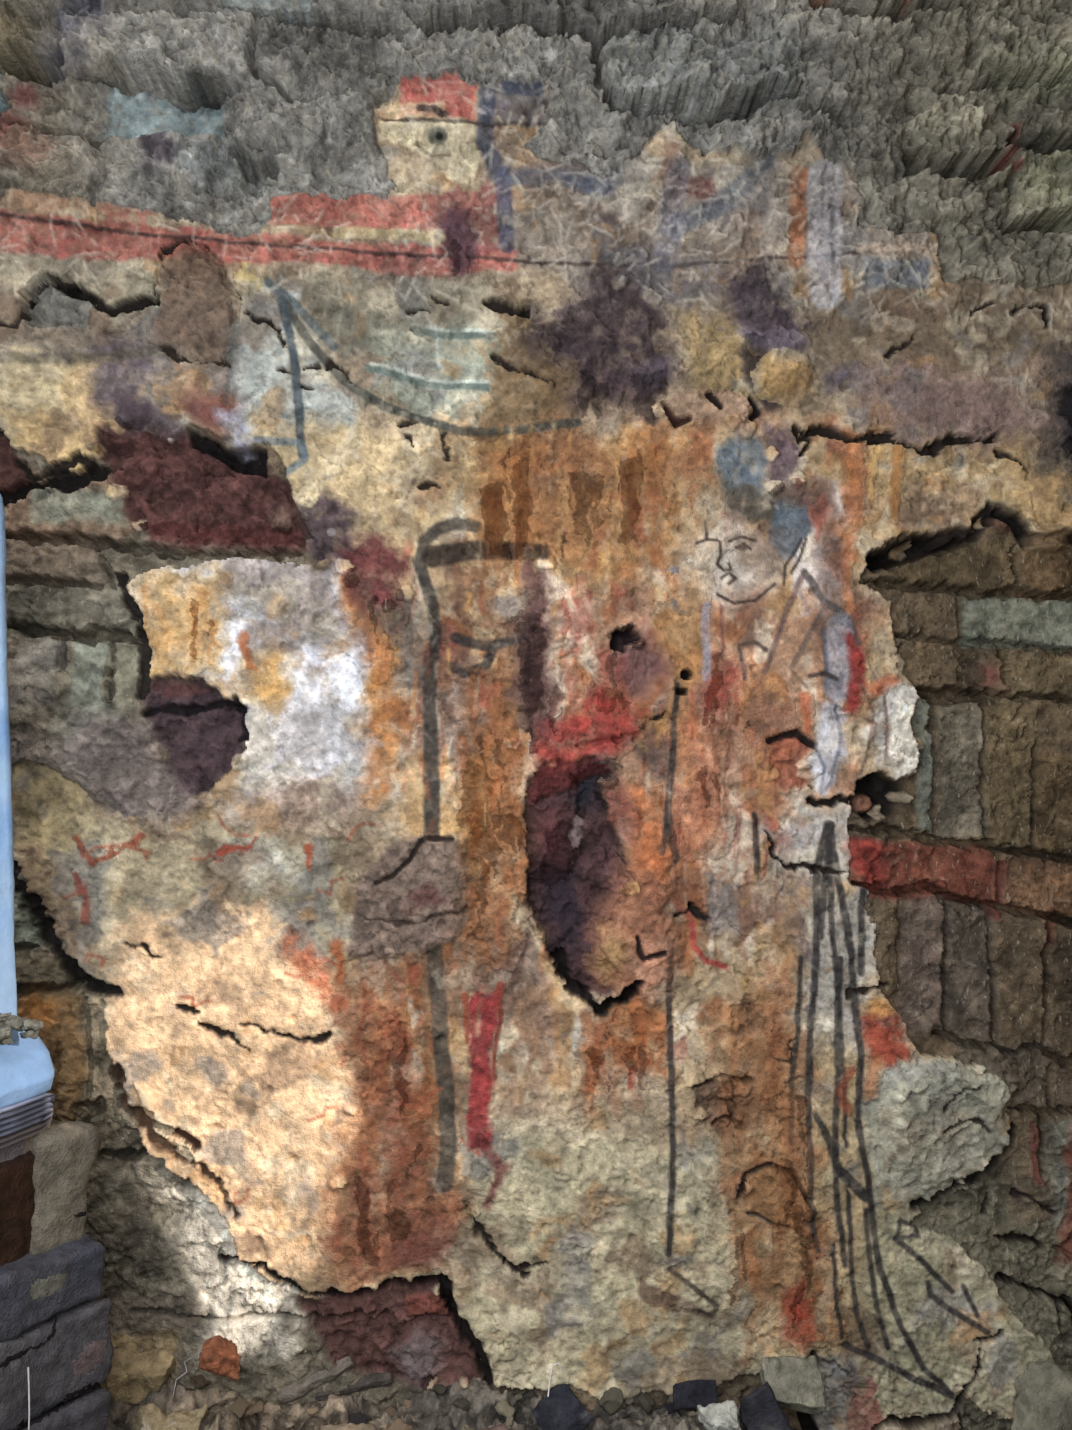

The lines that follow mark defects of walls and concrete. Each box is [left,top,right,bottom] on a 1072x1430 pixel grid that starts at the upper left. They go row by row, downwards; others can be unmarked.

flaking render [0,372,307,558]
leakage [478,257,690,441]
leakage [712,251,1072,518]
crack [791,423,1030,475]
flaking render [865,500,1072,575]
flaking render [114,570,250,809]
flaking render [848,698,926,824]
flaking render [14,860,125,1000]
flaking render [523,759,641,1005]
crack [173,1003,333,1053]
peeling [879,1050,1021,1213]
flaking render [292,1272,496,1393]